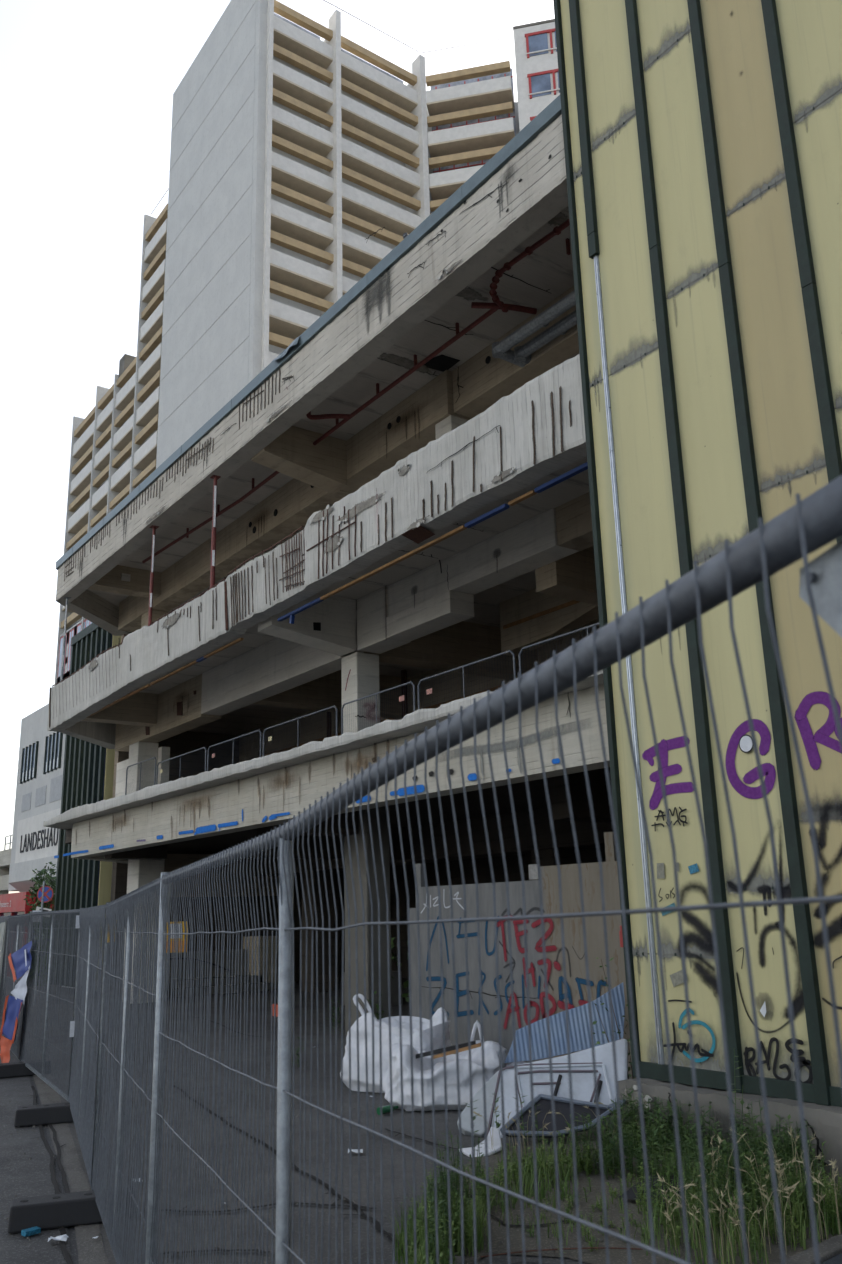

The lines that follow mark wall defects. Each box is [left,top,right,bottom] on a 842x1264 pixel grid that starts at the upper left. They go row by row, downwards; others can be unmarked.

water stain [644,22,691,71]
water stain [793,80,842,124]
water stain [727,170,786,216]
water stain [364,268,389,332]